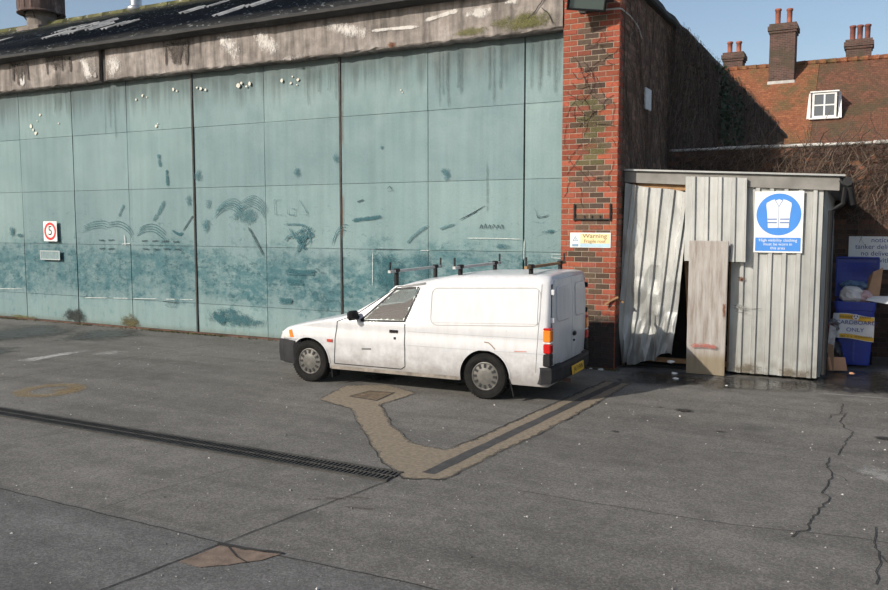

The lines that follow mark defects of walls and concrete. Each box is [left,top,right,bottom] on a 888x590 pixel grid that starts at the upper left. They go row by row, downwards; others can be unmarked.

water stain [82,215,193,250]
crack [791,405,854,537]
crack [873,527,888,584]